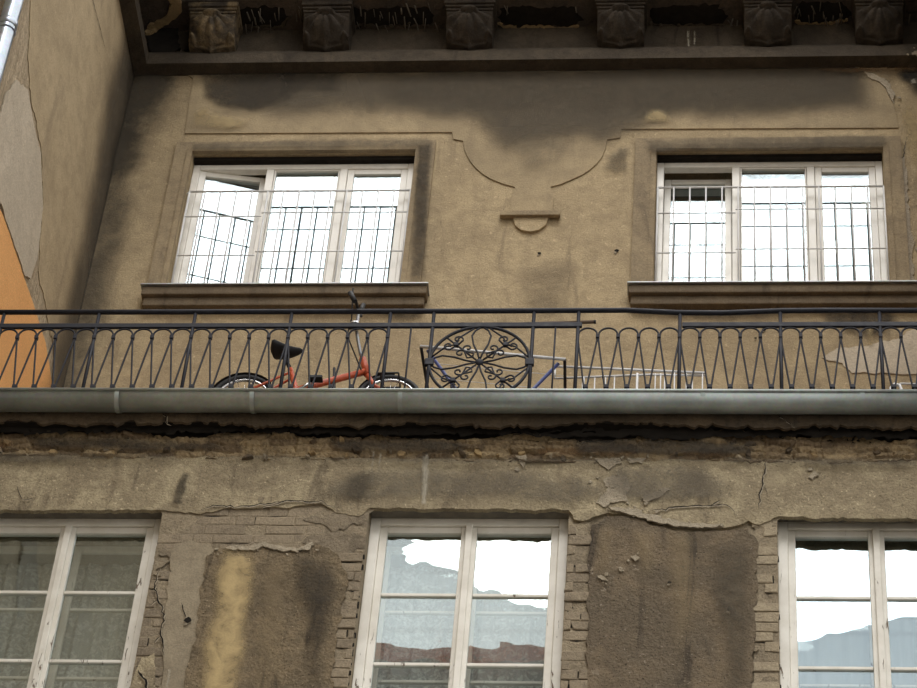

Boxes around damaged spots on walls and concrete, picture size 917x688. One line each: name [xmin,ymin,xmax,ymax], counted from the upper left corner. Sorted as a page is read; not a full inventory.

flaking render [145,0,182,52]
spalling [353,6,434,30]
spalling [497,5,583,28]
spalling [649,3,728,27]
damp [899,67,917,90]
spalling [0,429,917,529]
crack [152,568,186,656]
damp [205,556,251,688]
spalling [131,496,375,688]
crack [138,670,148,688]